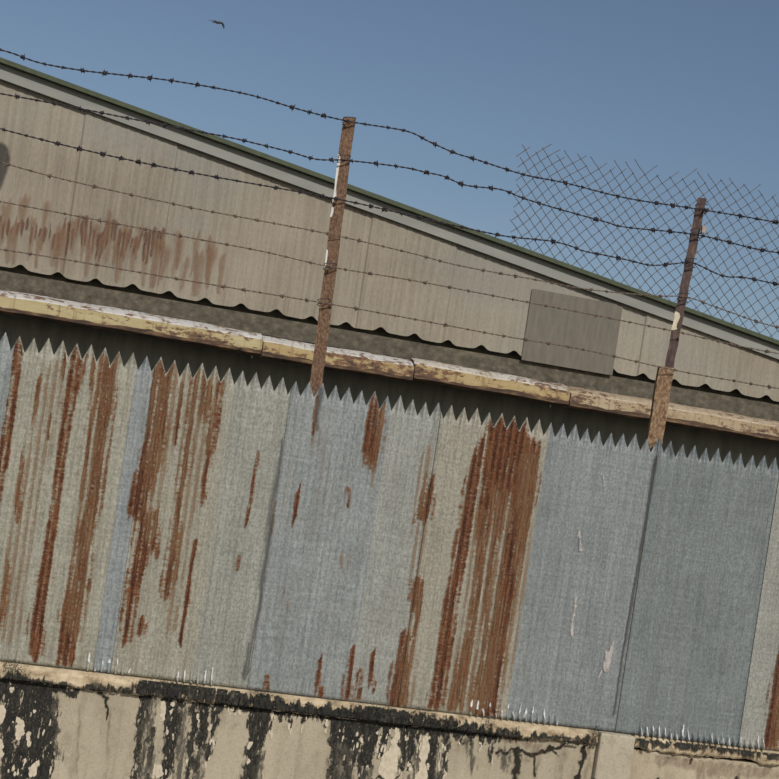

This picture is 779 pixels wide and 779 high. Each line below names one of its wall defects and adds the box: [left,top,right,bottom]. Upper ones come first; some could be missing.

rust [362,393,387,485]
rust [0,338,121,667]
rust [119,360,225,648]
rust [386,446,436,707]
rust [426,417,542,718]
water stain [0,669,599,779]
rust [315,653,324,697]
rust [341,644,377,700]
crack [495,734,596,779]
rust [765,654,779,750]